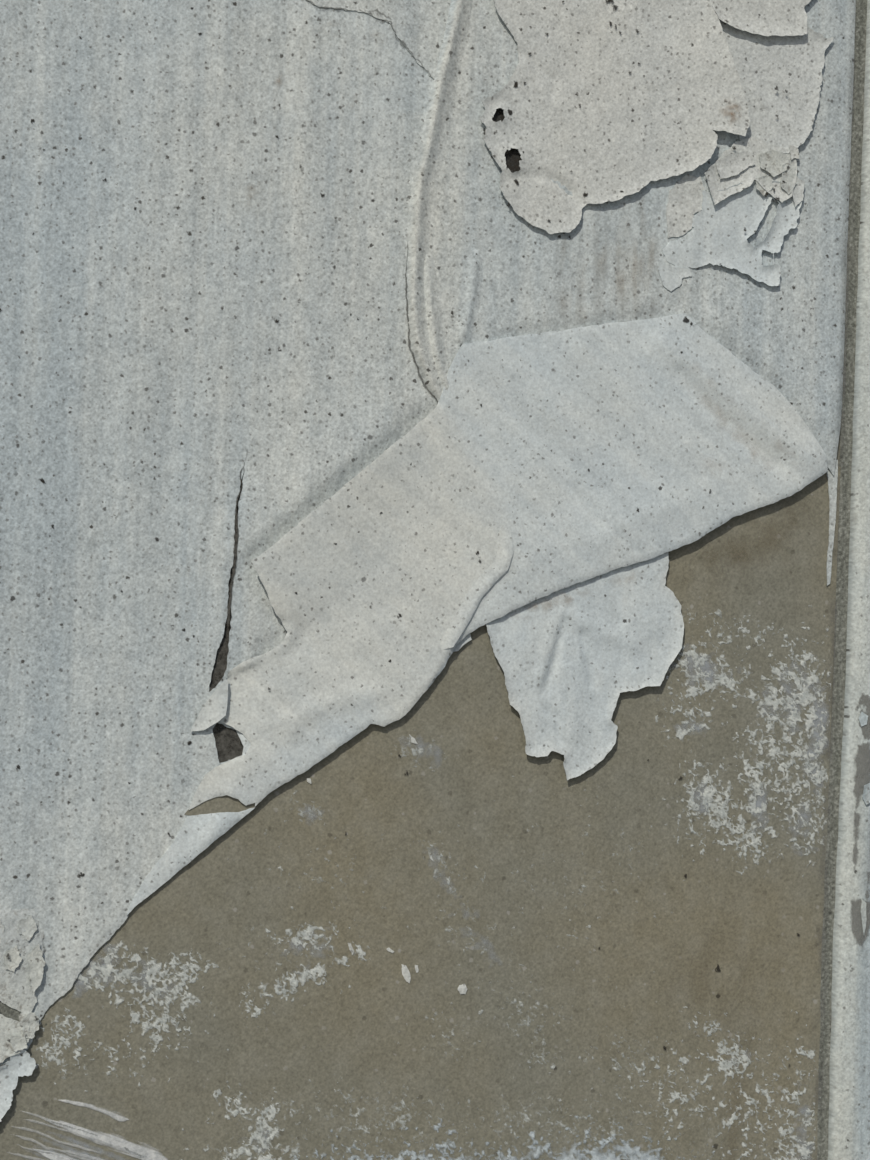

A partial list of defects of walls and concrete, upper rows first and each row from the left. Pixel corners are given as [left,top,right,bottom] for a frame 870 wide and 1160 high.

peeling [480,0,834,292]
crack [209,469,243,692]
peeling [0,313,841,1160]
spalling [853,693,870,864]
spalling [851,873,870,945]